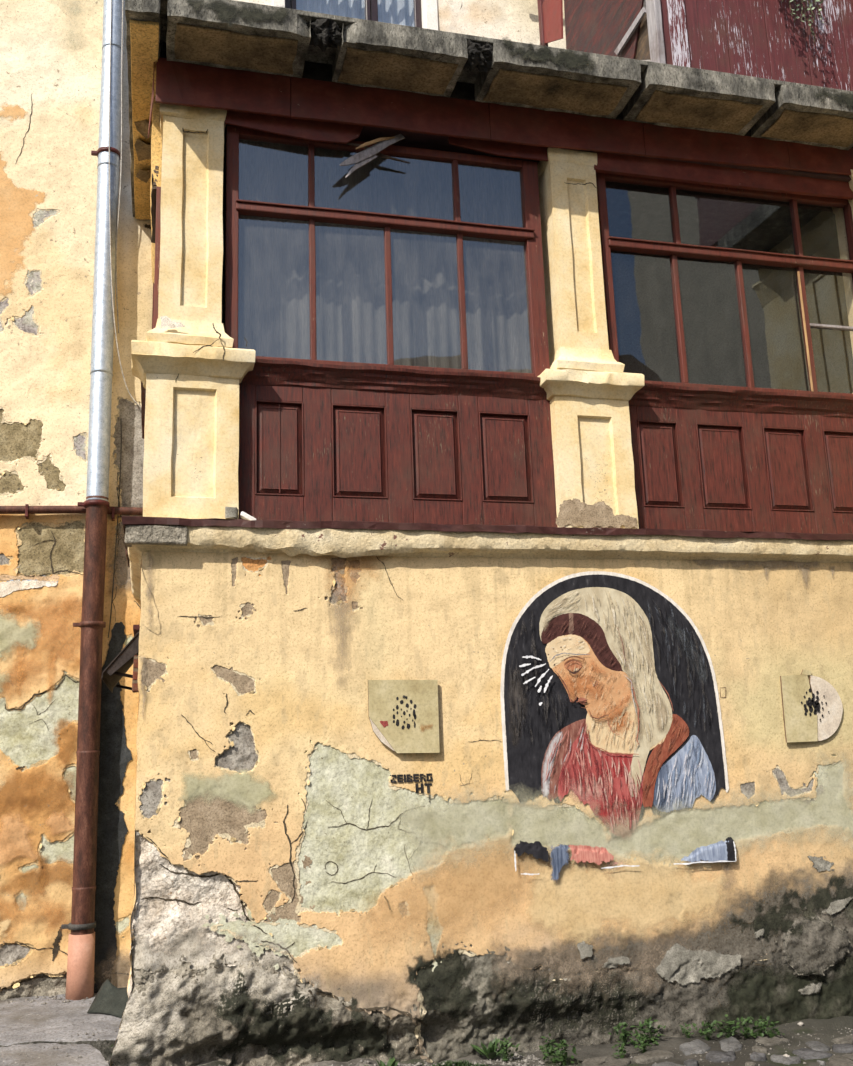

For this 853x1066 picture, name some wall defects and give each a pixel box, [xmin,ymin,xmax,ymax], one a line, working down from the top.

peeling [0,407,66,496]
peeling [0,519,86,577]
flaking render [556,498,637,529]
peeling [0,671,79,772]
spalling [214,722,260,773]
peeling [15,832,74,874]
crack [283,798,307,903]
crack [325,802,479,884]
peeling [115,740,853,999]
flaking render [0,972,67,1000]
crack [134,837,428,1056]
water stain [407,873,853,1051]